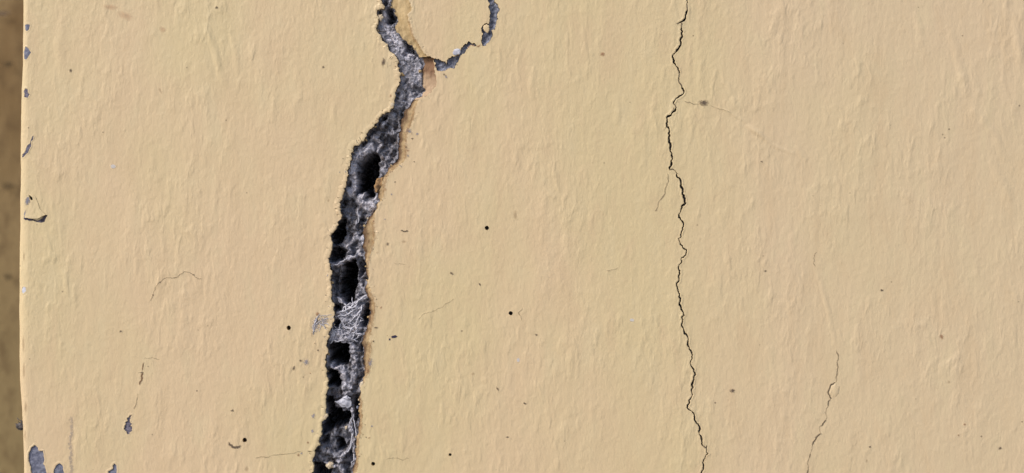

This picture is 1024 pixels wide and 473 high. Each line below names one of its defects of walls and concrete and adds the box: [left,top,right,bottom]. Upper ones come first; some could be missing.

peeling [23,22,33,61]
peeling [21,134,35,159]
peeling [24,195,47,223]
crack [656,0,723,473]
spalling [312,313,334,334]
peeling [122,413,134,436]
crack [807,352,840,473]
peeling [26,443,67,473]
peeling [106,461,119,473]